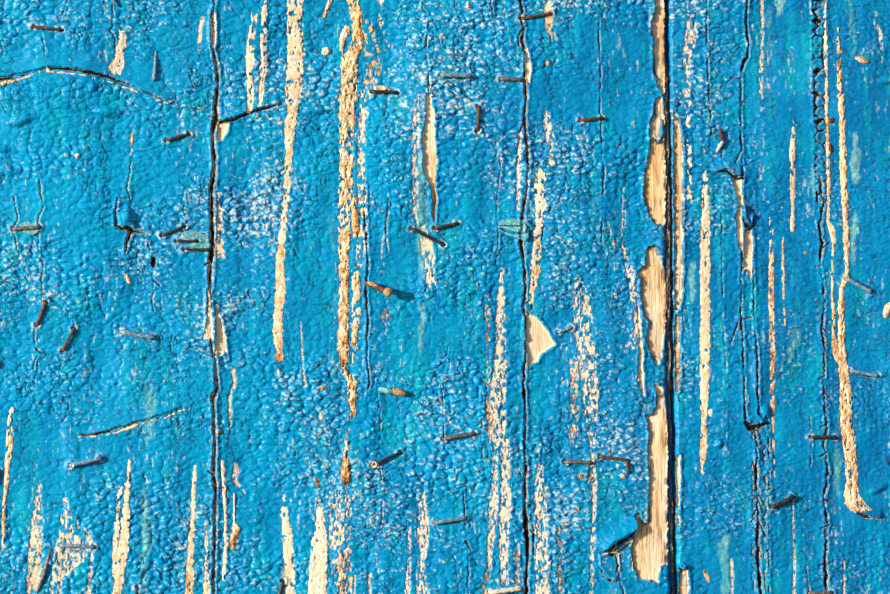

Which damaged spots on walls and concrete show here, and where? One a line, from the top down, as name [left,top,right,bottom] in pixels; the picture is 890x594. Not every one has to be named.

peeling [26,484,93,594]
crack [0,5,178,107]
crack [78,0,282,594]
peeling [272,0,304,375]
peeling [307,430,356,594]
peeling [321,0,392,418]
peeling [481,268,520,594]
crack [495,0,535,594]
peeling [498,108,555,367]
peeling [569,0,713,594]
peeling [812,2,871,513]
crack [806,0,887,593]